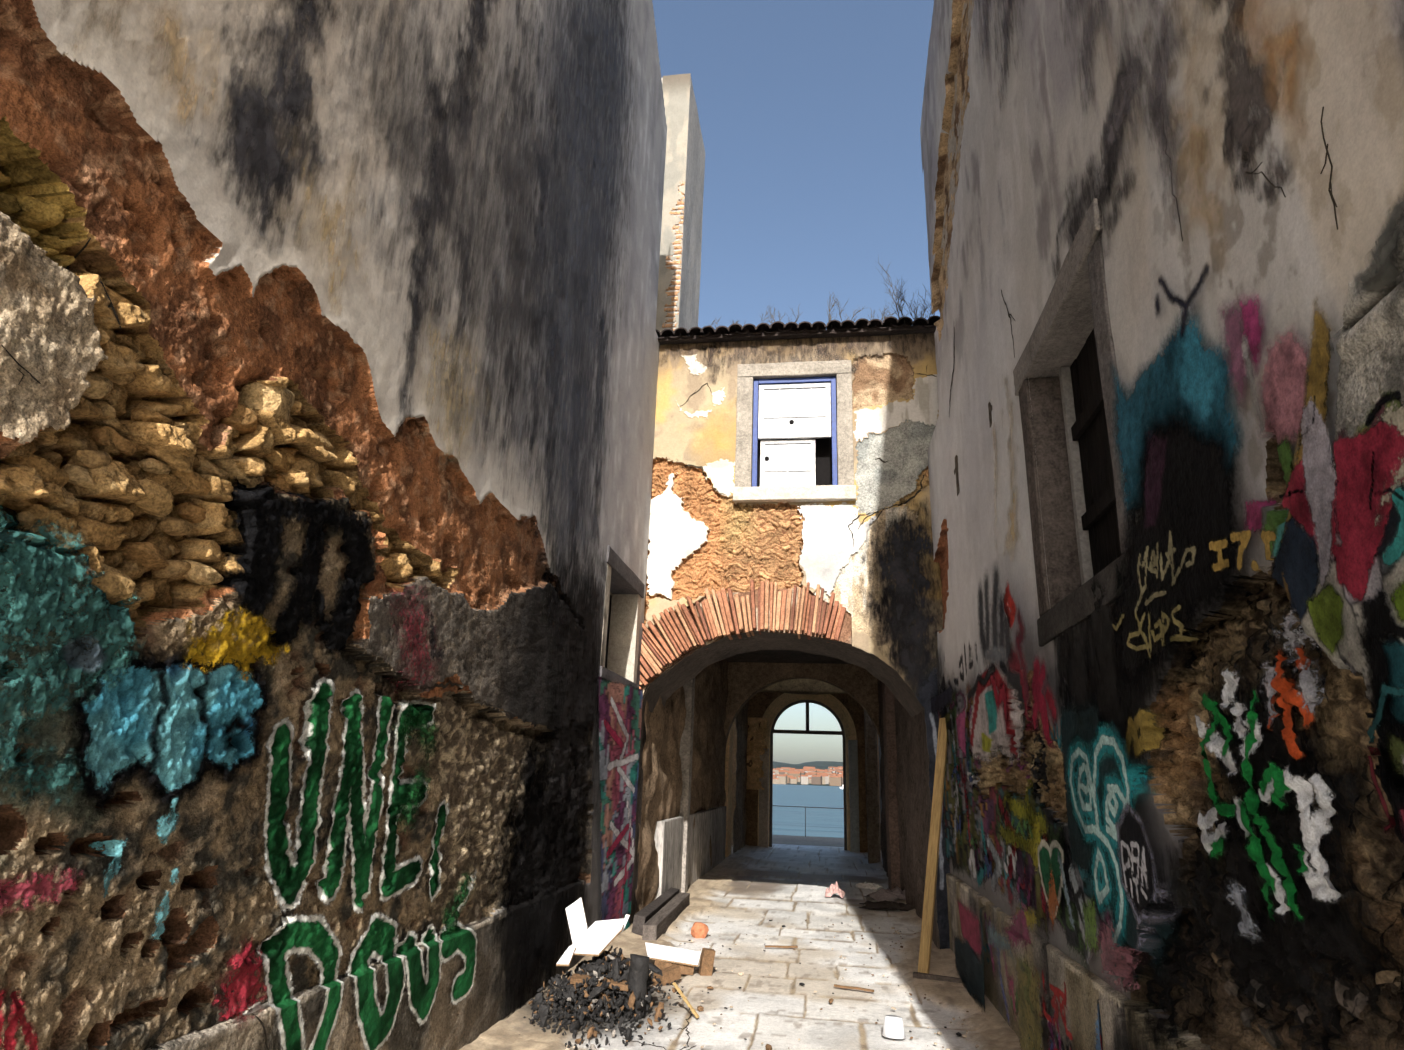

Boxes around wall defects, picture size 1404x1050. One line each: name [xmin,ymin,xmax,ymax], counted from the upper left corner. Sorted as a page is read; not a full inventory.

damp [352,0,633,572]
flaking render [682,354,707,375]
spalling [852,352,939,442]
spalling [931,0,972,341]
damp [1098,51,1176,209]
damp [1208,0,1287,203]
crack [1320,107,1338,230]
damp [1354,197,1404,296]
spalling [0,0,558,1050]
spalling [641,457,929,699]
damp [883,594,928,692]
spalling [1130,562,1404,1050]